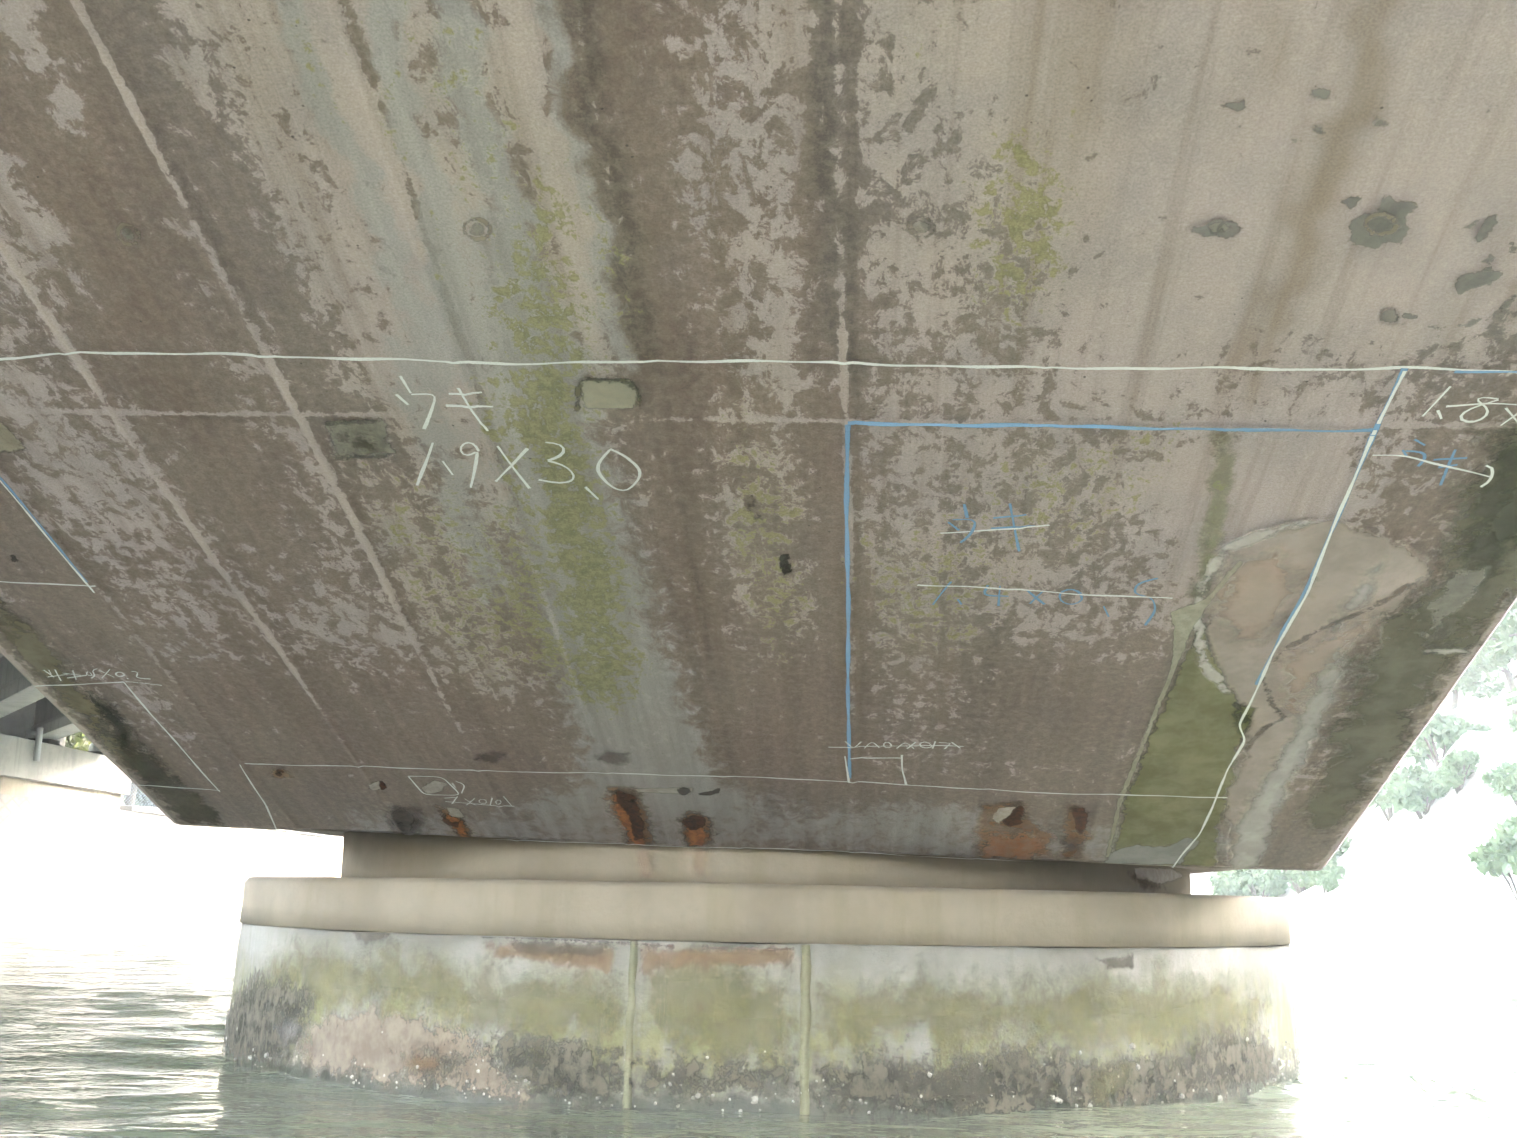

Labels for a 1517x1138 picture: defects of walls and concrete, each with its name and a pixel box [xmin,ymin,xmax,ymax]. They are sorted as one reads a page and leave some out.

leakage [1193,520,1430,869]
leakage [598,753,627,764]
rust [435,805,471,837]
rust [603,787,656,845]
rust [677,811,713,847]
rust [973,801,1092,860]
leakage [497,942,612,970]